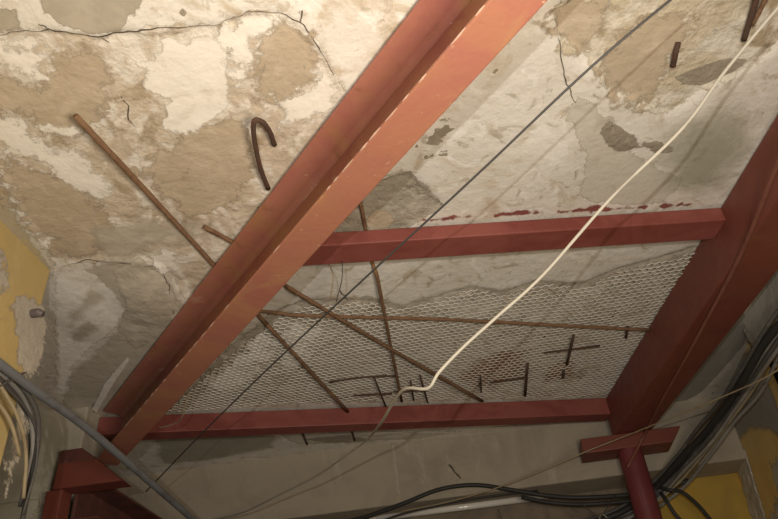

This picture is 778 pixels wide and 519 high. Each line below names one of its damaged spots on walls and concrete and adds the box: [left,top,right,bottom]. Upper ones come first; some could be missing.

crack [0,10,344,89]
flaking render [0,9,347,391]
spalling [539,0,778,205]
flaking render [738,448,778,519]